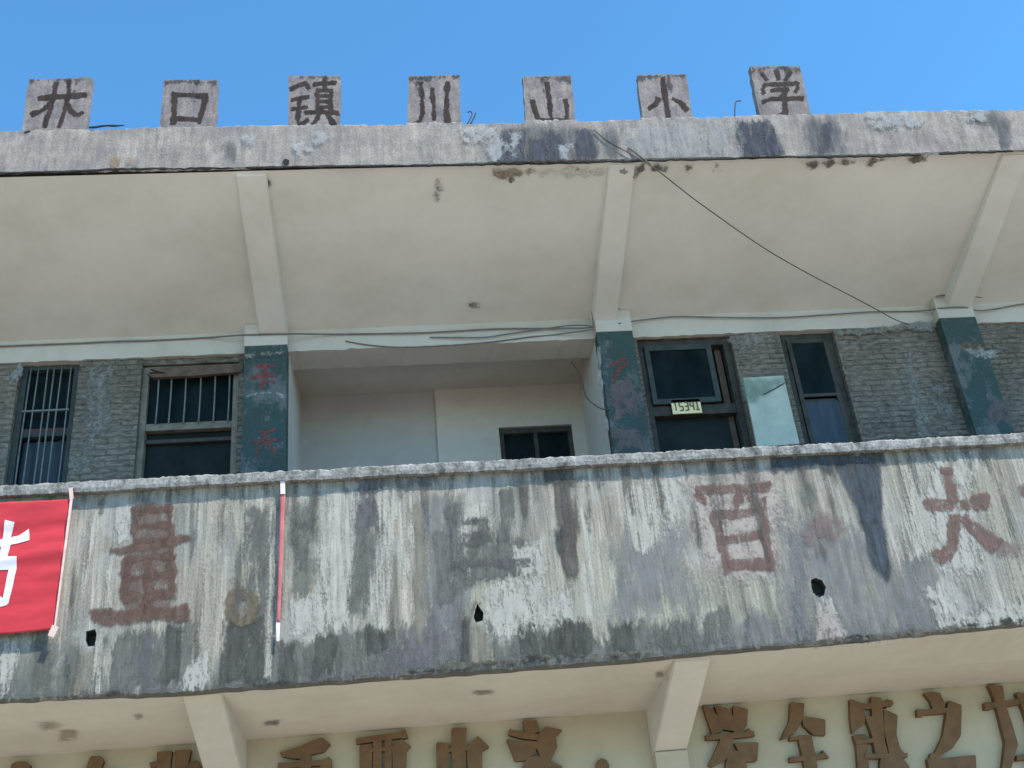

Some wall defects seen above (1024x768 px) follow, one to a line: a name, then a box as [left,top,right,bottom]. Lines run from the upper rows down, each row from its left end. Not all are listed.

peeling [460,125,605,183]
leakage [497,123,623,161]
leakage [734,118,785,156]
leakage [804,116,848,154]
spalling [806,157,885,170]
leakage [970,110,1012,149]
peeling [961,343,996,359]
leakage [0,447,1024,701]
peeling [794,581,1024,648]